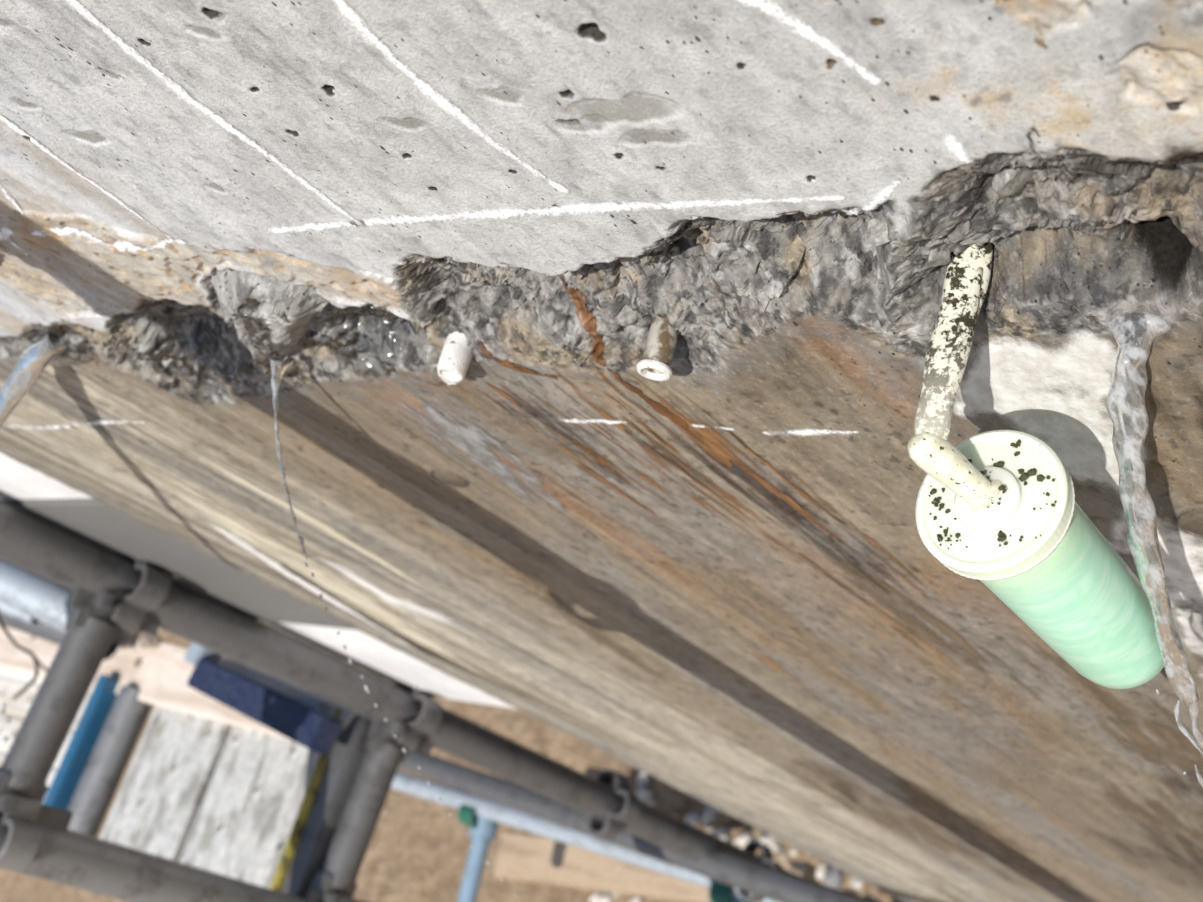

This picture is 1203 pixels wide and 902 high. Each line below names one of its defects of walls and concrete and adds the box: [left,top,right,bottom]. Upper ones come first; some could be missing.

peeling [73,133,102,142]
peeling [488,92,518,101]
peeling [634,132,677,142]
peeling [1119,43,1203,114]
spalling [0,146,1203,406]
rust [477,276,927,597]
damp [953,331,1120,494]
damp [1110,510,1131,553]
damp [1157,518,1203,656]
damp [1077,672,1203,795]